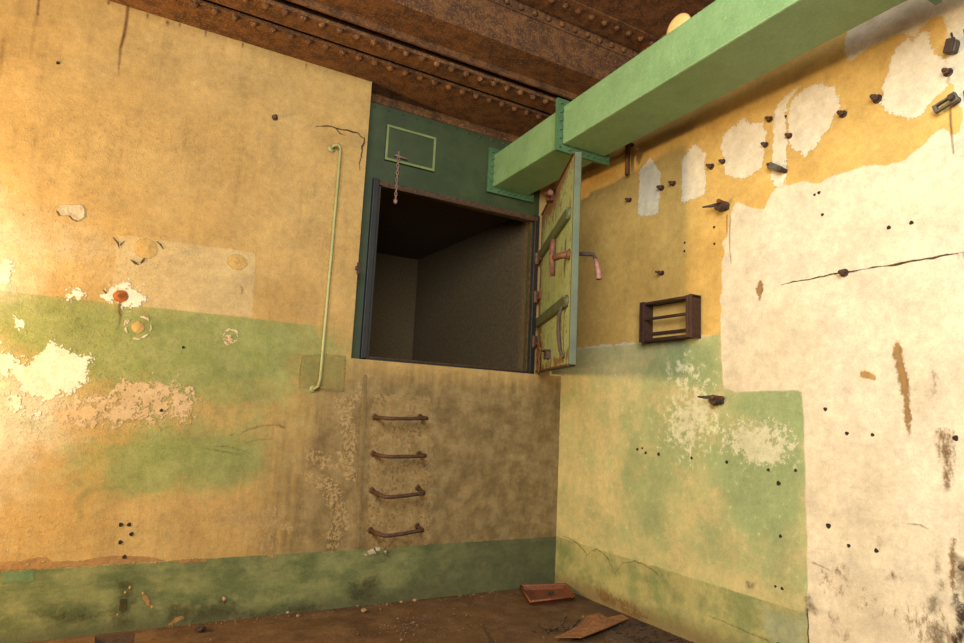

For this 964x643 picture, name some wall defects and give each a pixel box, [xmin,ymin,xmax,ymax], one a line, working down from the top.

peeling [879,30,949,121]
peeling [720,82,841,188]
spalling [56,204,85,222]
peeling [0,257,16,285]
crack [782,252,962,285]
peeling [58,287,87,301]
peeling [0,339,206,436]